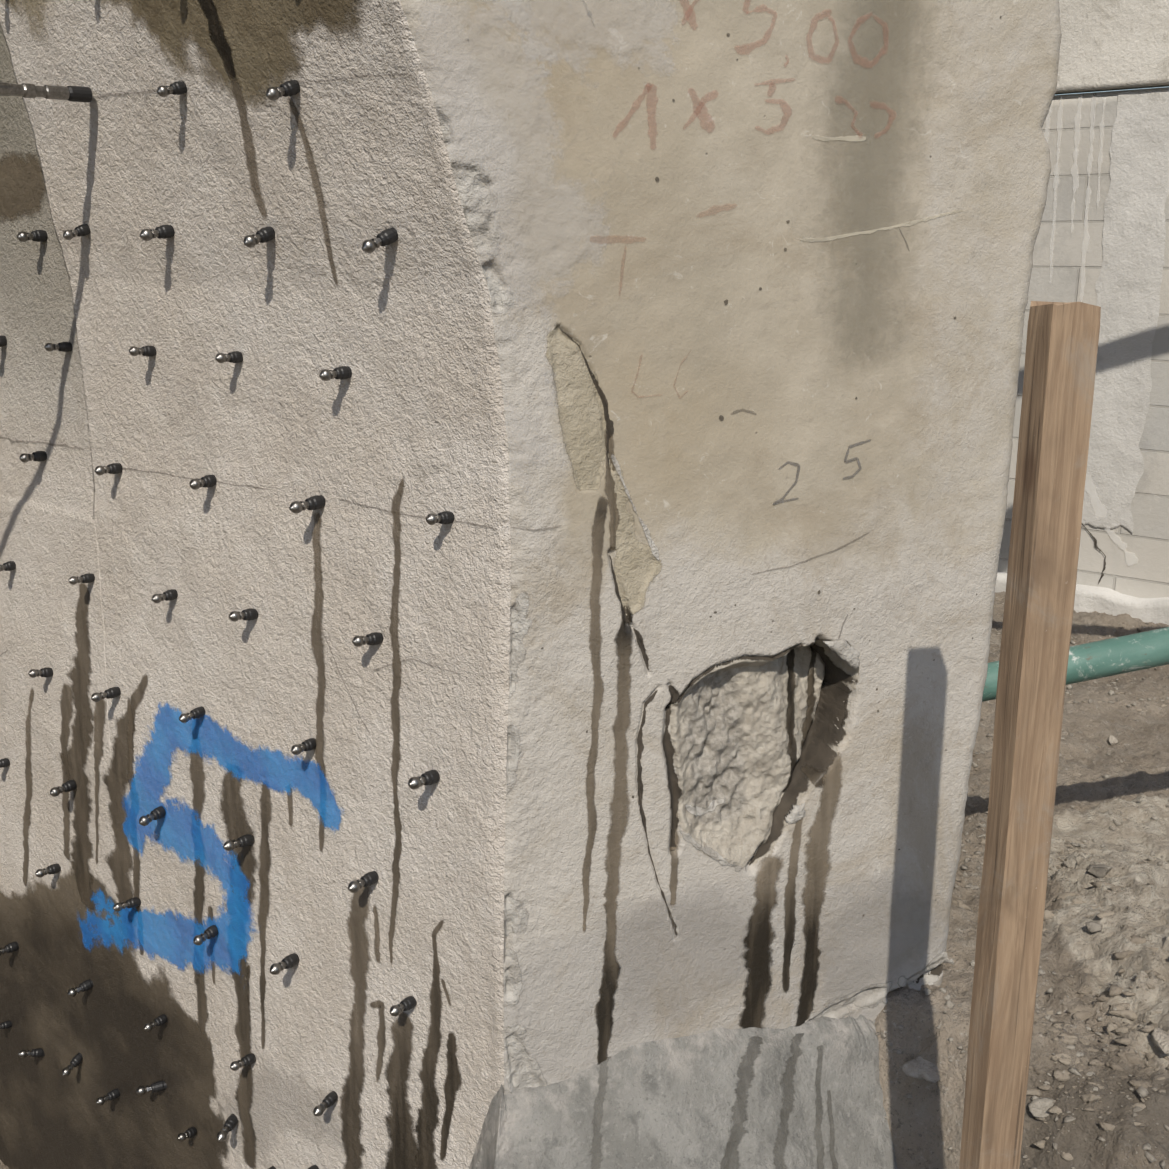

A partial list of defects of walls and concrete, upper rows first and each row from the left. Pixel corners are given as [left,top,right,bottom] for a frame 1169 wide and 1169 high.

damp [0,153,45,221]
damp [112,0,360,217]
damp [288,98,337,284]
crack [1082,524,1106,584]
damp [0,583,271,1169]
damp [582,432,633,1169]
crack [634,628,680,935]
damp [670,813,679,905]
spalling [663,638,860,871]
damp [720,754,842,1169]